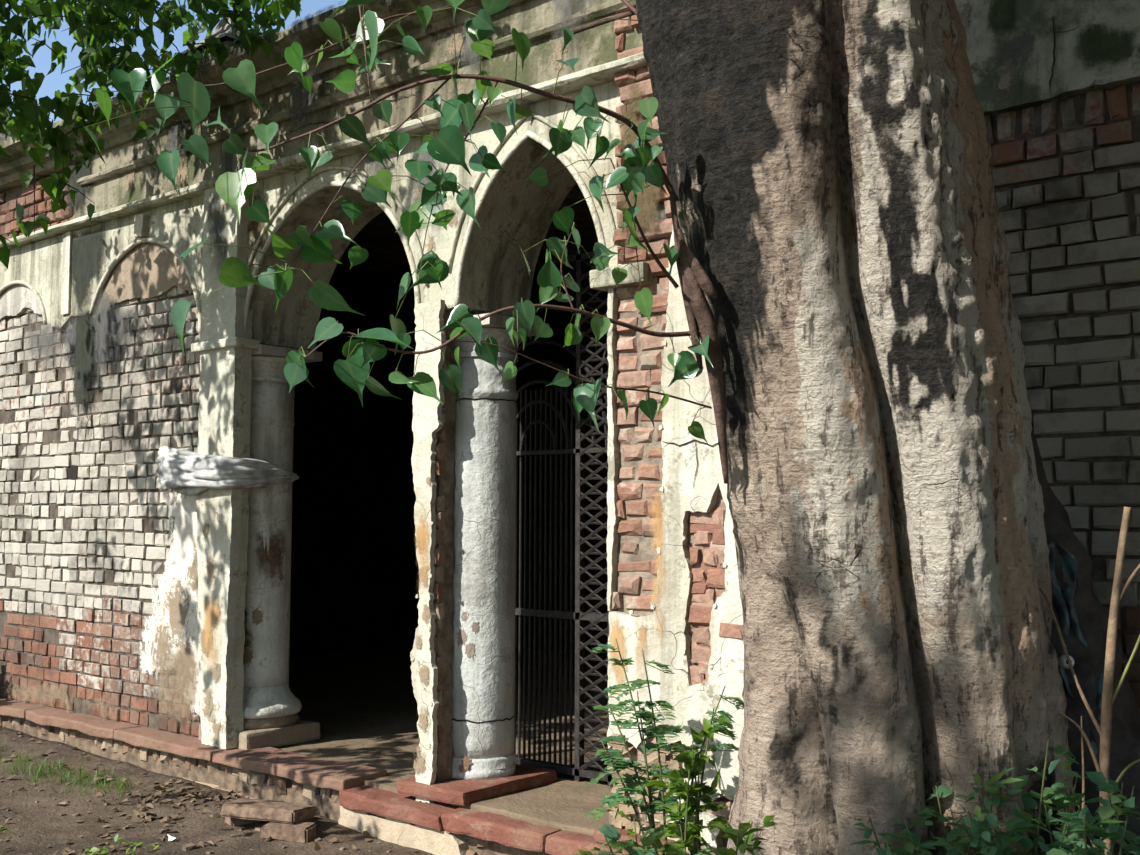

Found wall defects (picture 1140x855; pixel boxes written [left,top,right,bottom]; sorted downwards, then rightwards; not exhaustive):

spalling [68,465,78,480]
peeling [151,522,220,745]
spalling [681,507,727,683]